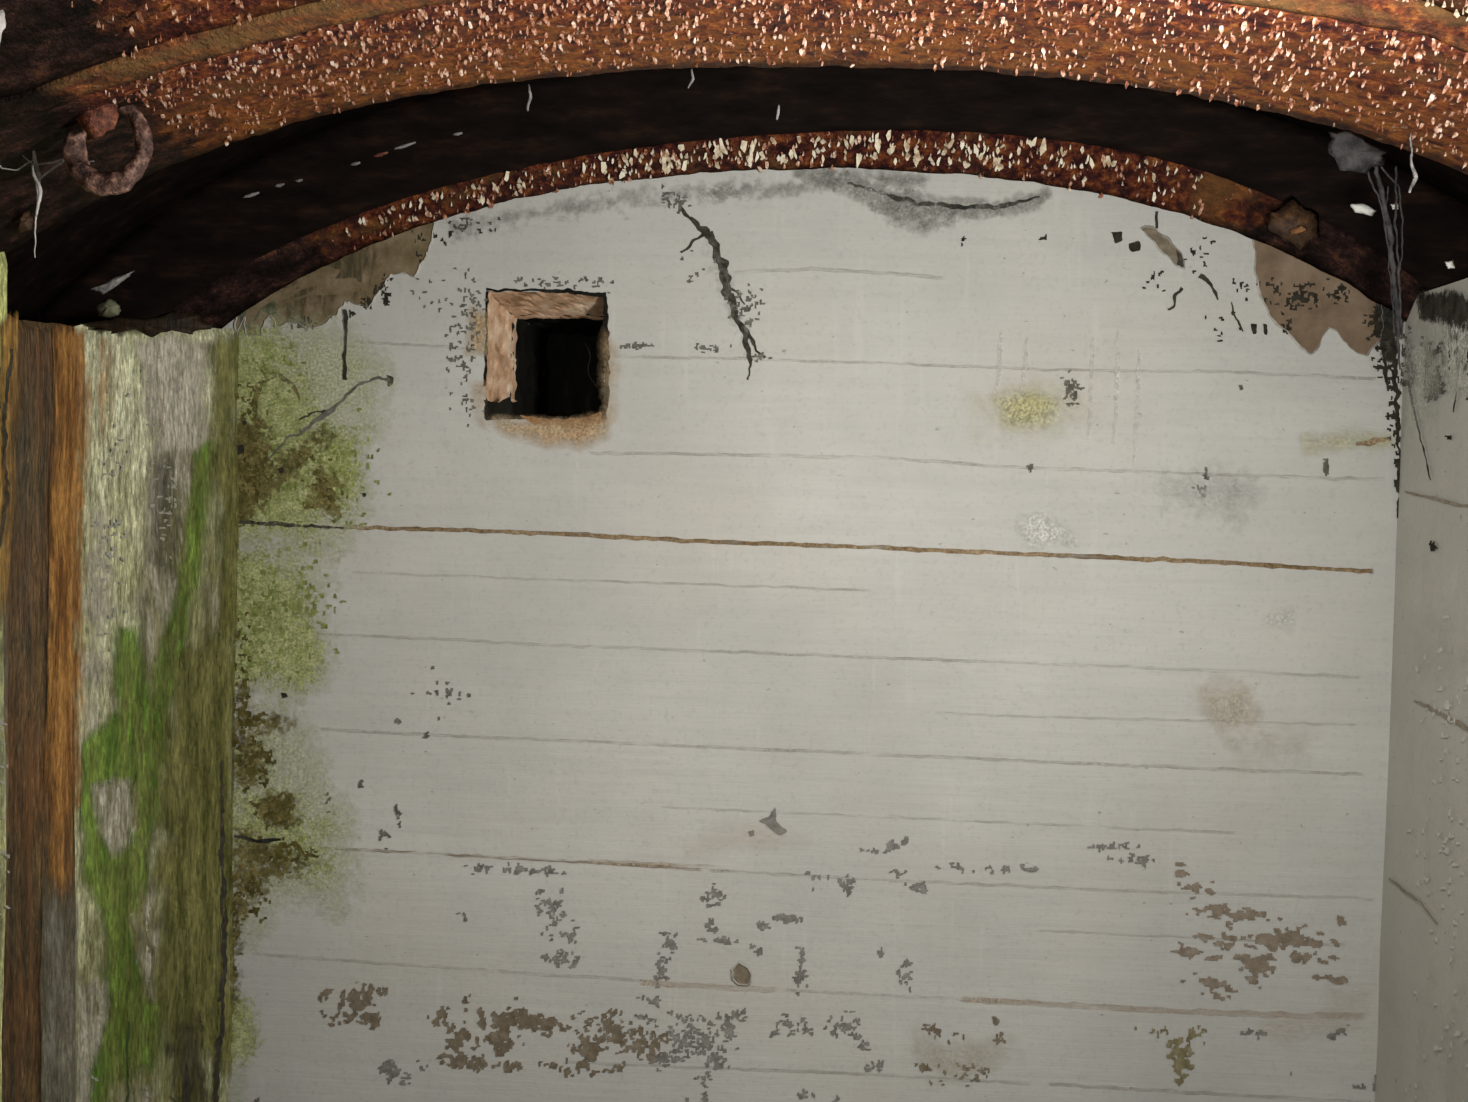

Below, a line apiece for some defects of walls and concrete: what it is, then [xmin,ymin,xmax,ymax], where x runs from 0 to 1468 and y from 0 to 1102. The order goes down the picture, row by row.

peeling [233,162,564,337]
damp [662,184,692,214]
crack [676,198,766,380]
damp [724,283,765,333]
peeling [583,130,1186,270]
peeling [1252,239,1384,356]
damp [1356,290,1468,518]
damp [239,520,344,529]
peeling [378,932,748,1102]
peeling [697,883,803,986]
peeling [792,946,809,996]
peeling [1171,862,1348,1001]